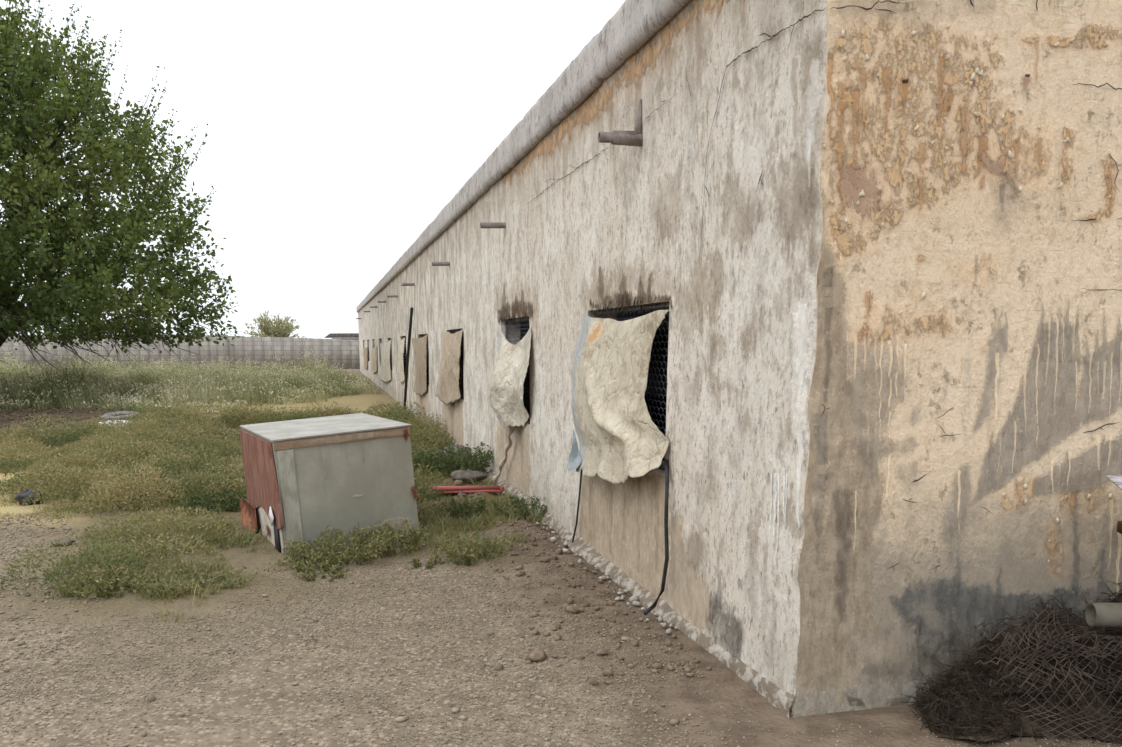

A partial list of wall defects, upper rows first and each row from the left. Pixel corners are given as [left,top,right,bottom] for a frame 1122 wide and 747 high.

peeling [1023,24,1122,49]
crack [1072,82,1122,90]
crack [698,0,910,279]
peeling [821,17,1044,257]
crack [529,147,609,203]
peeling [1088,154,1122,222]
water stain [618,277,651,305]
water stain [774,153,1122,717]
water stain [769,474,787,569]